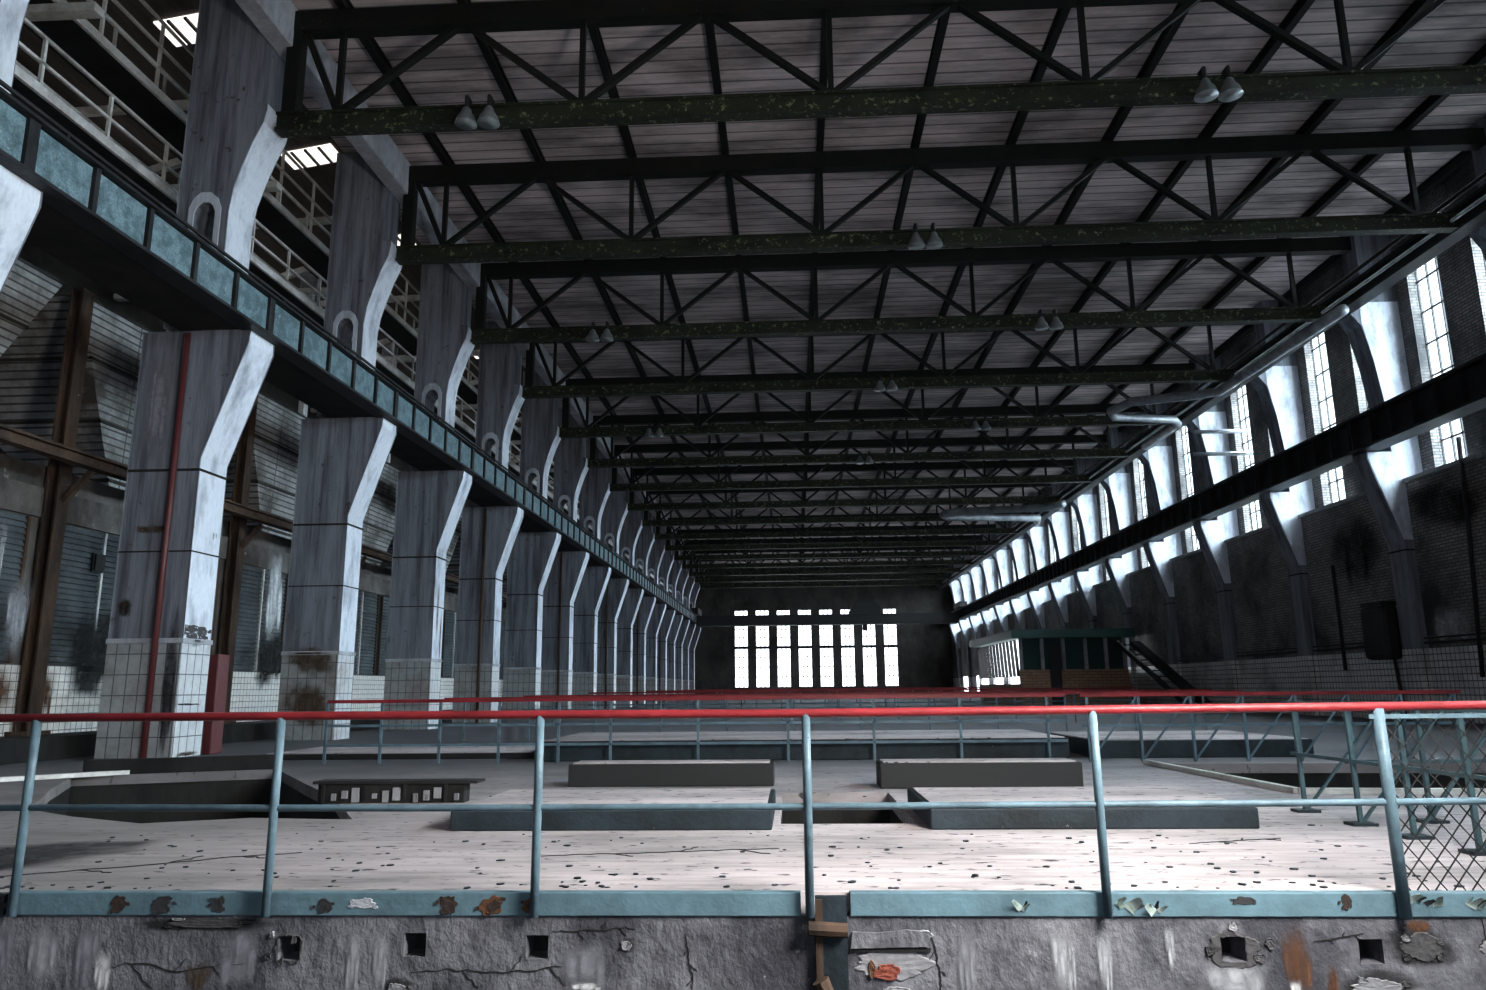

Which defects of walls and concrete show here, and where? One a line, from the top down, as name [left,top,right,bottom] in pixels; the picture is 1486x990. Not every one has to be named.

rust [0,674,9,703]
spalling [1347,931,1450,990]